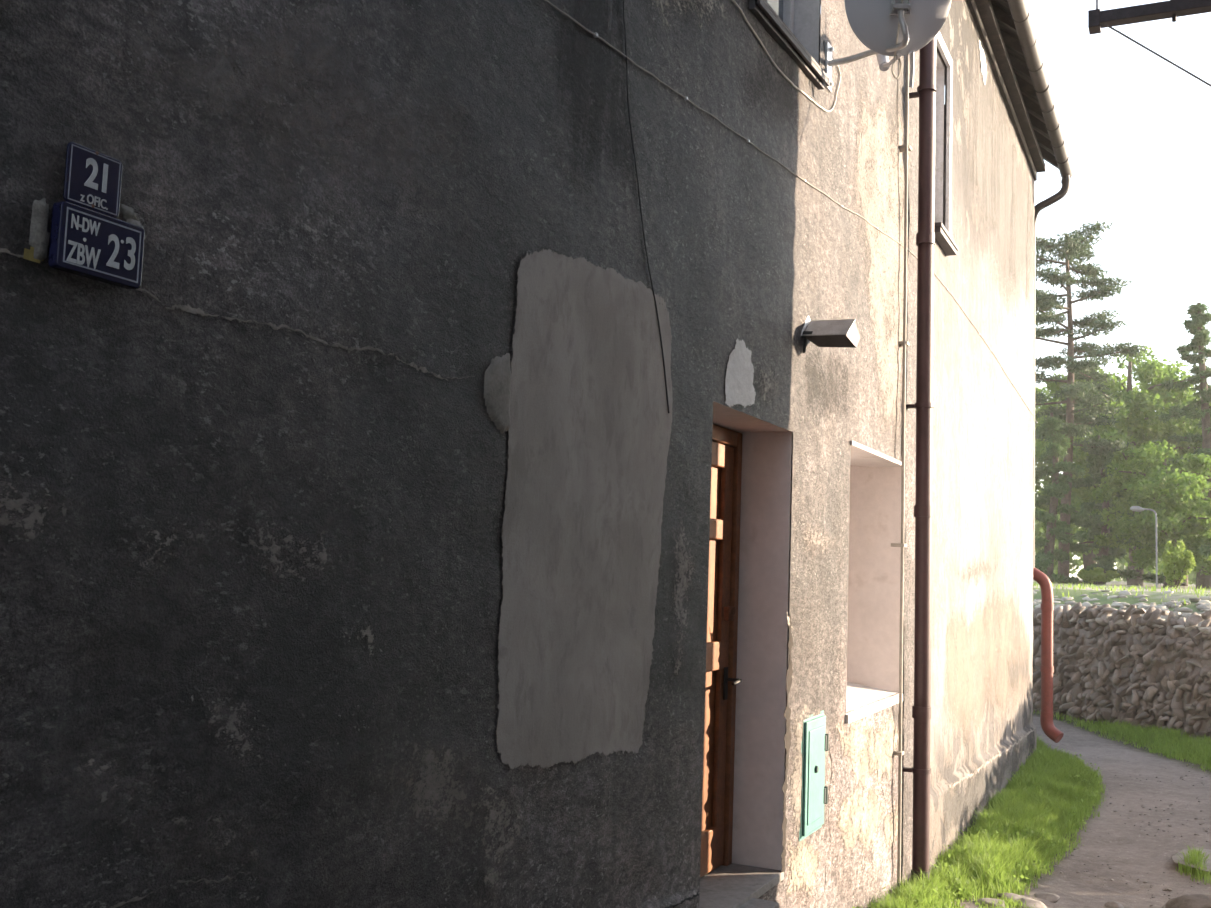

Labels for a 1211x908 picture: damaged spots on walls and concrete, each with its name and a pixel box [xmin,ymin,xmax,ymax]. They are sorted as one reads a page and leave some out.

crack [0,248,24,258]
crack [136,288,475,381]
crack [0,464,73,542]